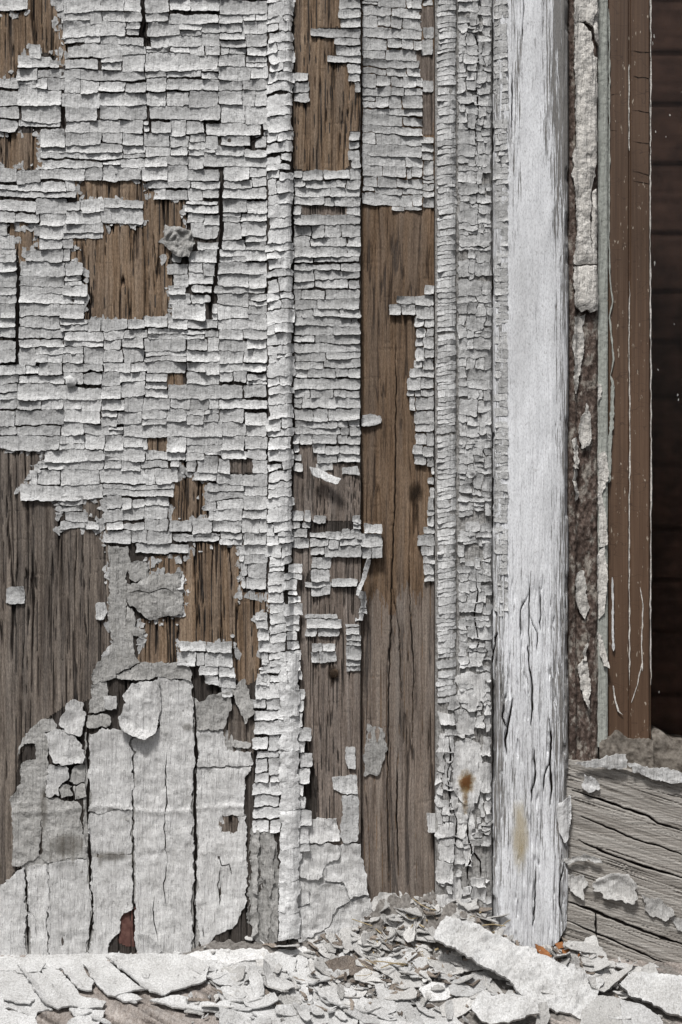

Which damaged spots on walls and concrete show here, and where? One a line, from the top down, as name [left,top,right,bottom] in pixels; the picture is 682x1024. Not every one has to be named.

crack [210,175,223,311]
peeling [0,0,509,1024]
crack [447,2,682,915]
crack [83,699,95,950]
crack [131,753,168,952]
corrosion [459,773,473,808]
crack [532,871,681,962]
peeling [564,854,682,931]
peeling [575,754,682,793]